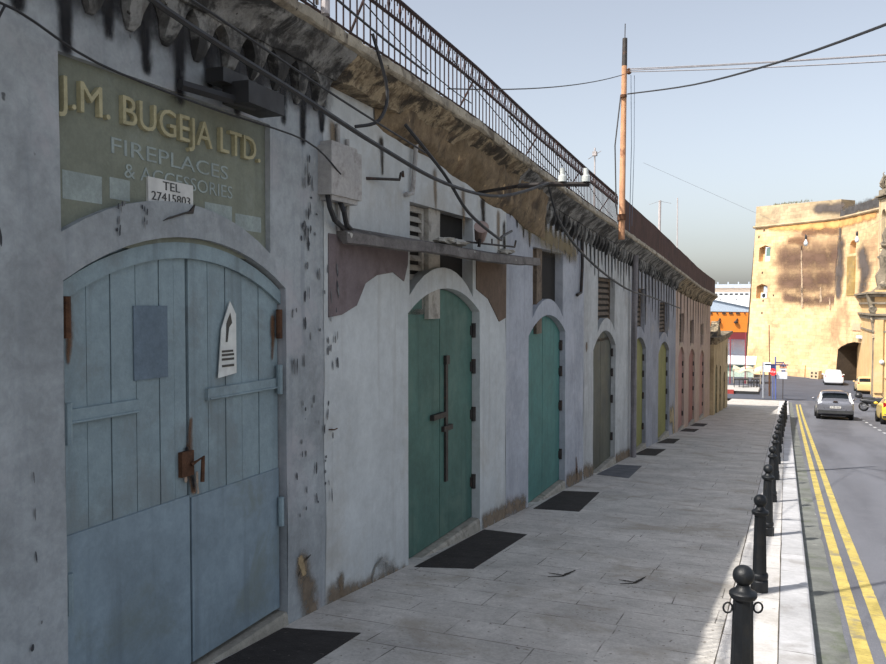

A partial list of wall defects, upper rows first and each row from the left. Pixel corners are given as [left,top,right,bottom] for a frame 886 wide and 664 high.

leakage [769,213,876,310]